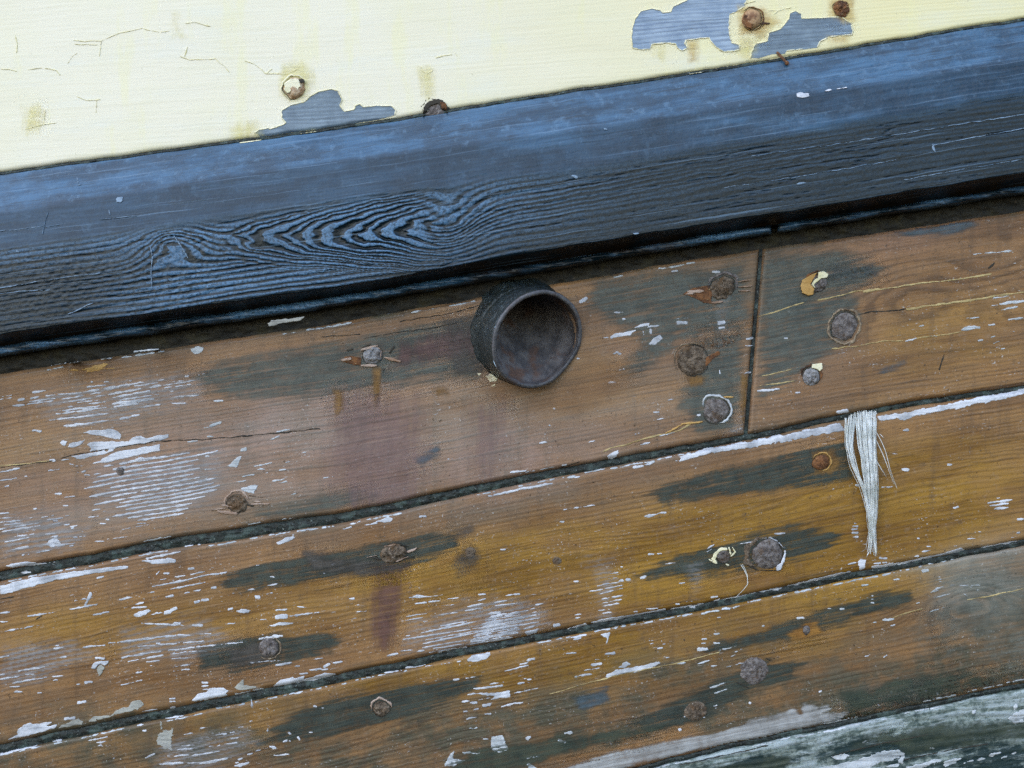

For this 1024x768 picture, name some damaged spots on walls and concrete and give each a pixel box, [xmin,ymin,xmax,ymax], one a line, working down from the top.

crack [4,22,297,75]
peeling [631,0,853,63]
rust [741,8,775,34]
peeling [240,89,396,143]
crack [0,428,320,468]
peeling [228,447,290,494]
peeling [0,349,243,686]
peeling [248,513,402,545]
peeling [0,518,1024,768]